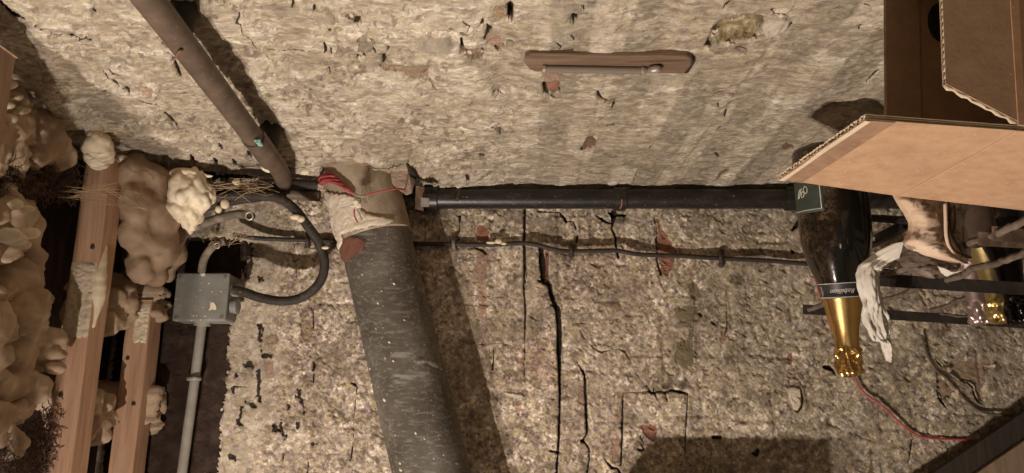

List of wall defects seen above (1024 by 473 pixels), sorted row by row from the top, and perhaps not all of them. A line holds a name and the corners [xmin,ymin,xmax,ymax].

spalling [704,13,789,55]
flaking render [542,73,560,100]
flaking render [656,218,677,276]
crack [457,209,688,473]
flaking render [637,424,657,452]